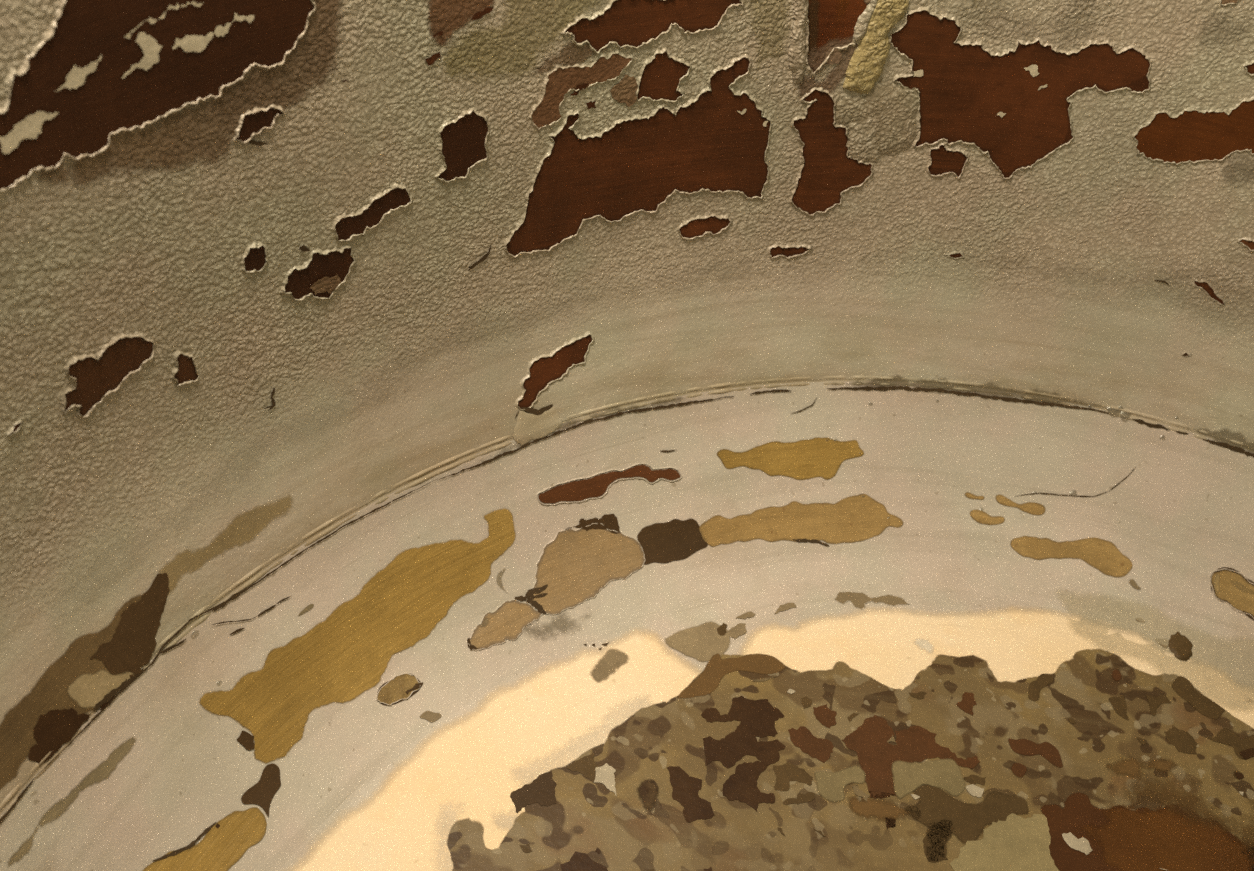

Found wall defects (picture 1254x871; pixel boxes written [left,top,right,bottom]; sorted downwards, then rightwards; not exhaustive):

peeling [0,0,316,193]
peeling [503,0,773,260]
peeling [788,0,881,217]
peeling [888,6,1152,181]
peeling [1131,96,1254,166]
peeling [60,331,155,419]
peeling [512,331,596,446]
peeling [536,463,682,506]
peeling [717,437,864,480]
peeling [466,494,910,651]
peeling [143,508,515,871]
peeling [665,611,1254,871]